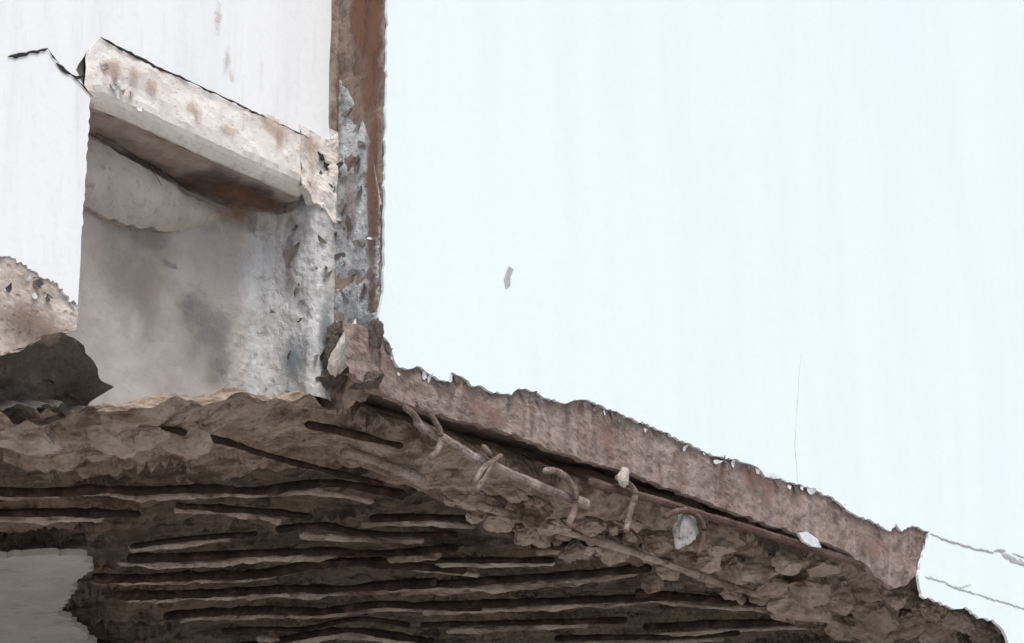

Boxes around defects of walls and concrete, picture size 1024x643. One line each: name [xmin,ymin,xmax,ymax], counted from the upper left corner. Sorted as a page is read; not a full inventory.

crack [8,48,93,97]
rust [350,0,382,259]
spalling [0,256,114,416]
peeling [314,80,927,590]
spalling [0,420,809,643]